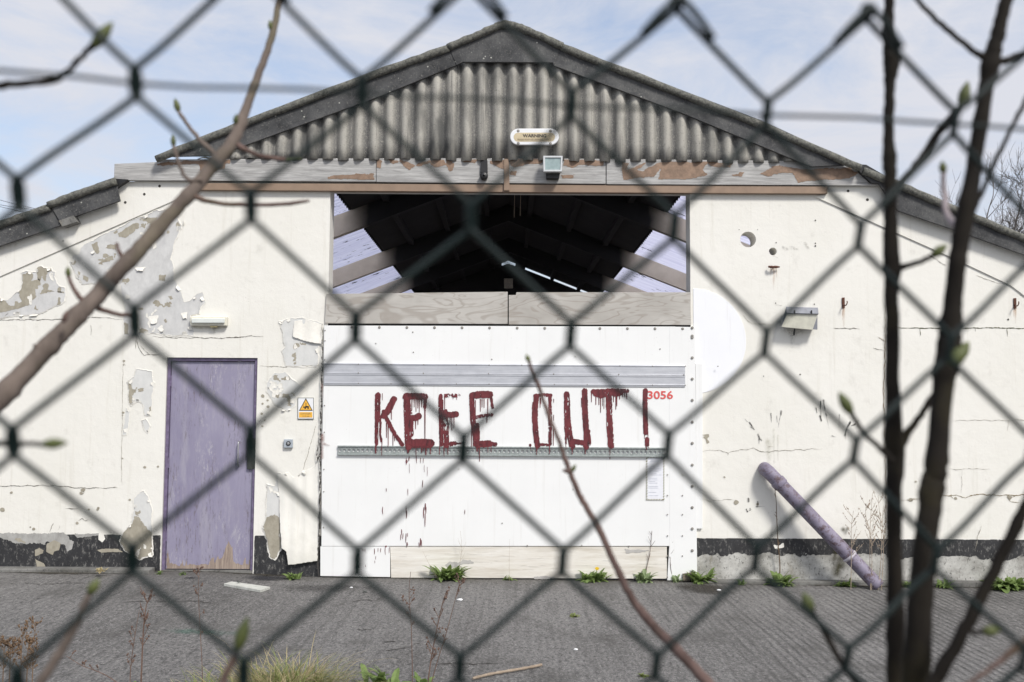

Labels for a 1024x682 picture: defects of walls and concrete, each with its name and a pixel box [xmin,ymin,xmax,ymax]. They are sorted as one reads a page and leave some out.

peeling [622,161,744,180]
peeling [761,165,858,183]
peeling [0,265,67,319]
peeling [70,209,165,285]
peeling [119,217,206,337]
peeling [122,360,156,436]
peeling [260,317,324,427]
peeling [0,526,74,567]
peeling [98,490,154,560]
peeling [262,472,282,561]